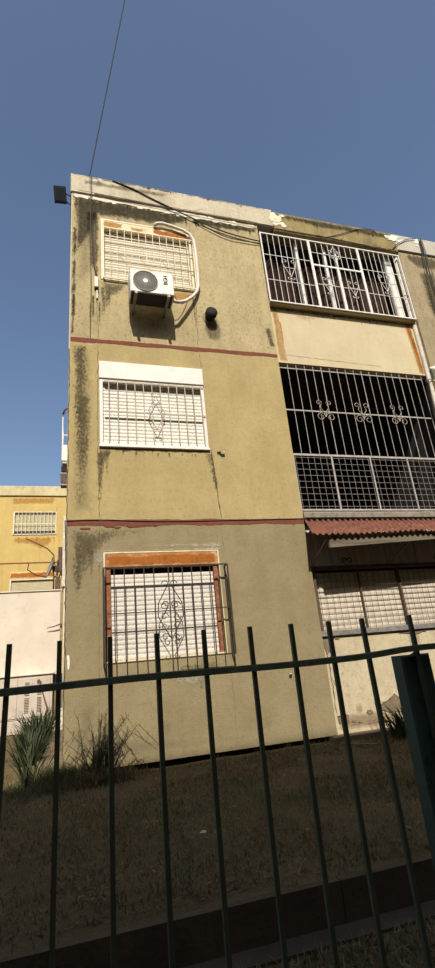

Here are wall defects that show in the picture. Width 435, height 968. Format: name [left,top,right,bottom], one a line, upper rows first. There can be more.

peeling [269,212,287,227]
leakage [71,197,255,332]
leakage [408,255,435,313]
leakage [75,347,88,462]
leakage [76,532,108,577]
spalling [337,694,401,724]